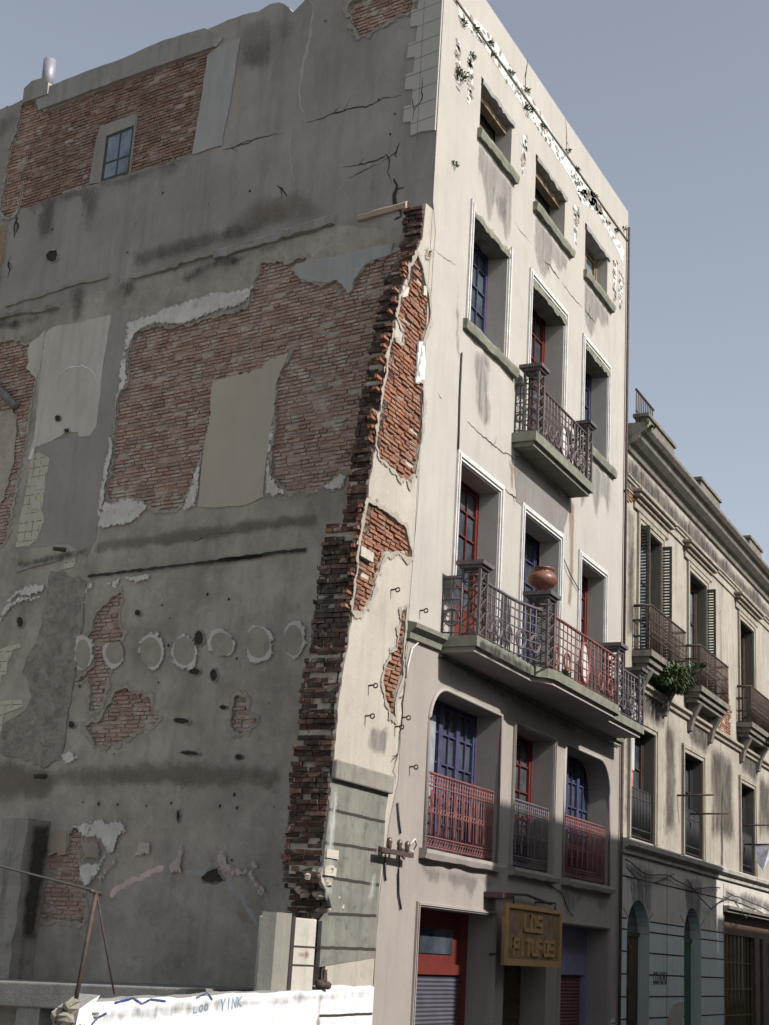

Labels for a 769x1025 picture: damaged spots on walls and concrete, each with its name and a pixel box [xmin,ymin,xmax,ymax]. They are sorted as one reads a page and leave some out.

flaking render [342,0,417,40]
flaking render [0,101,49,220]
crack [310,77,423,122]
crack [346,143,403,220]
flaking render [454,4,625,311]
flaking render [0,335,37,547]
flaking render [97,243,433,528]
flaking render [341,496,415,619]
flaking render [0,571,192,768]
flaking render [38,819,126,929]
spalling [50,998,99,1025]